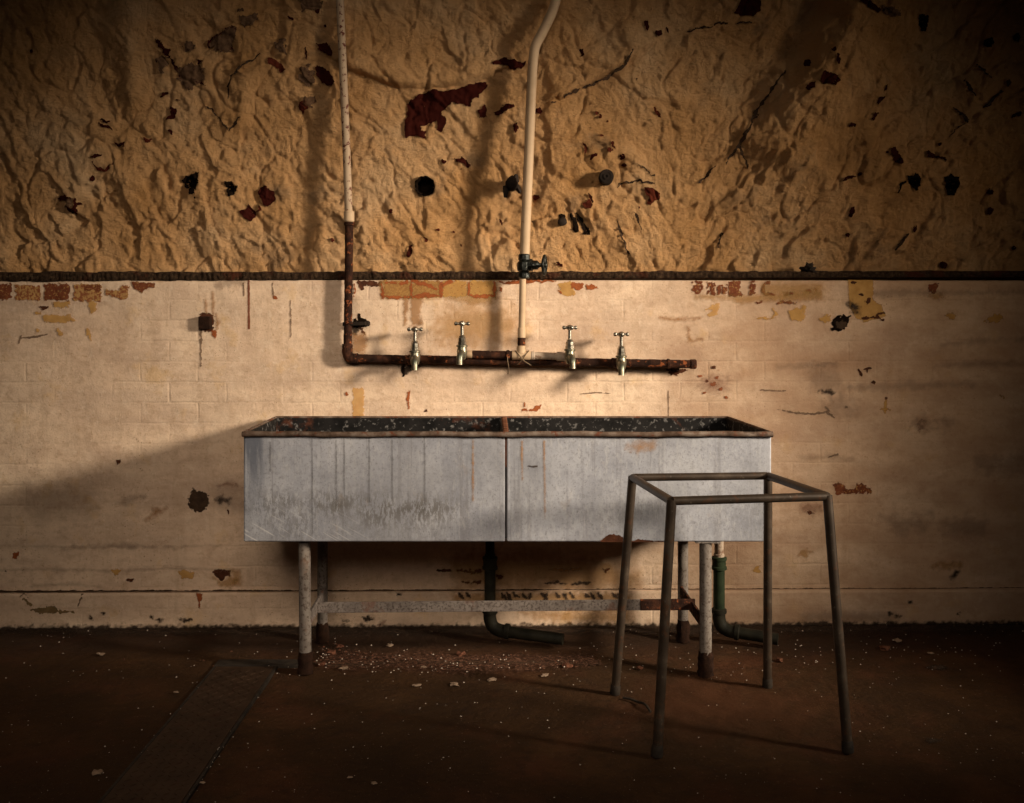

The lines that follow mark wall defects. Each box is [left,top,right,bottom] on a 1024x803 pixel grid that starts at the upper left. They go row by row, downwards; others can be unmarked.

crack [551,49,634,103]
peeling [404,82,515,139]
peeling [239,185,276,221]
peeling [0,281,155,336]
peeling [353,280,599,303]
peeling [691,280,820,322]
peeling [820,280,886,332]
peeling [212,569,234,586]